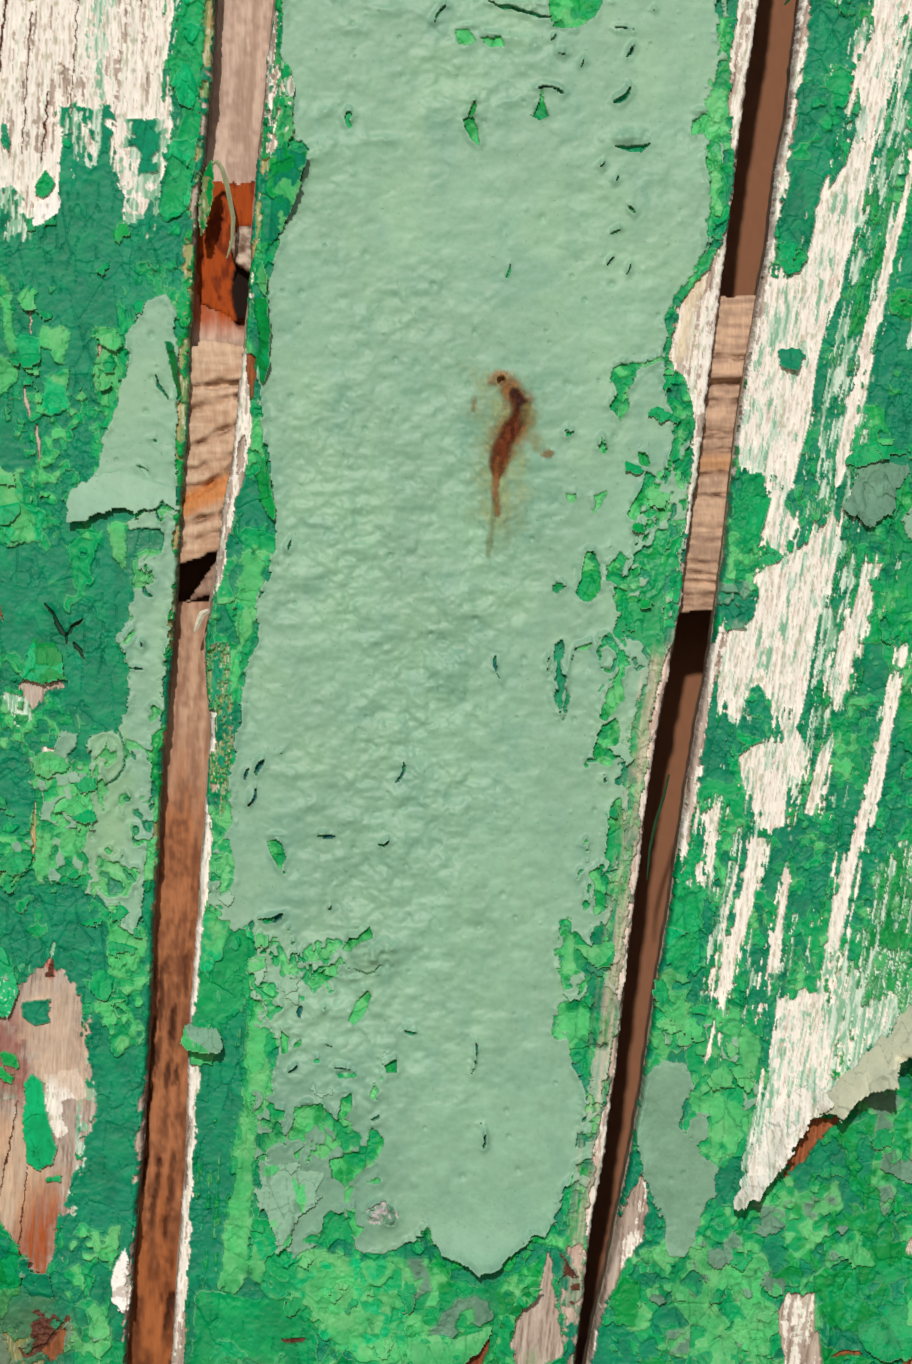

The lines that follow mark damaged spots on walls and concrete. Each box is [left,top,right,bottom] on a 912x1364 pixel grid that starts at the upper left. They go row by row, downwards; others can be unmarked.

peeling [0,0,215,248]
peeling [66,468,179,522]
peeling [156,341,181,400]
peeling [209,61,307,620]
rust [491,372,529,520]
peeling [18,638,67,710]
peeling [366,0,912,1364]
spalling [268,840,286,870]
peeling [0,902,142,1304]
peeling [172,795,234,1364]
spalling [250,1083,390,1270]
peeling [110,1249,133,1315]